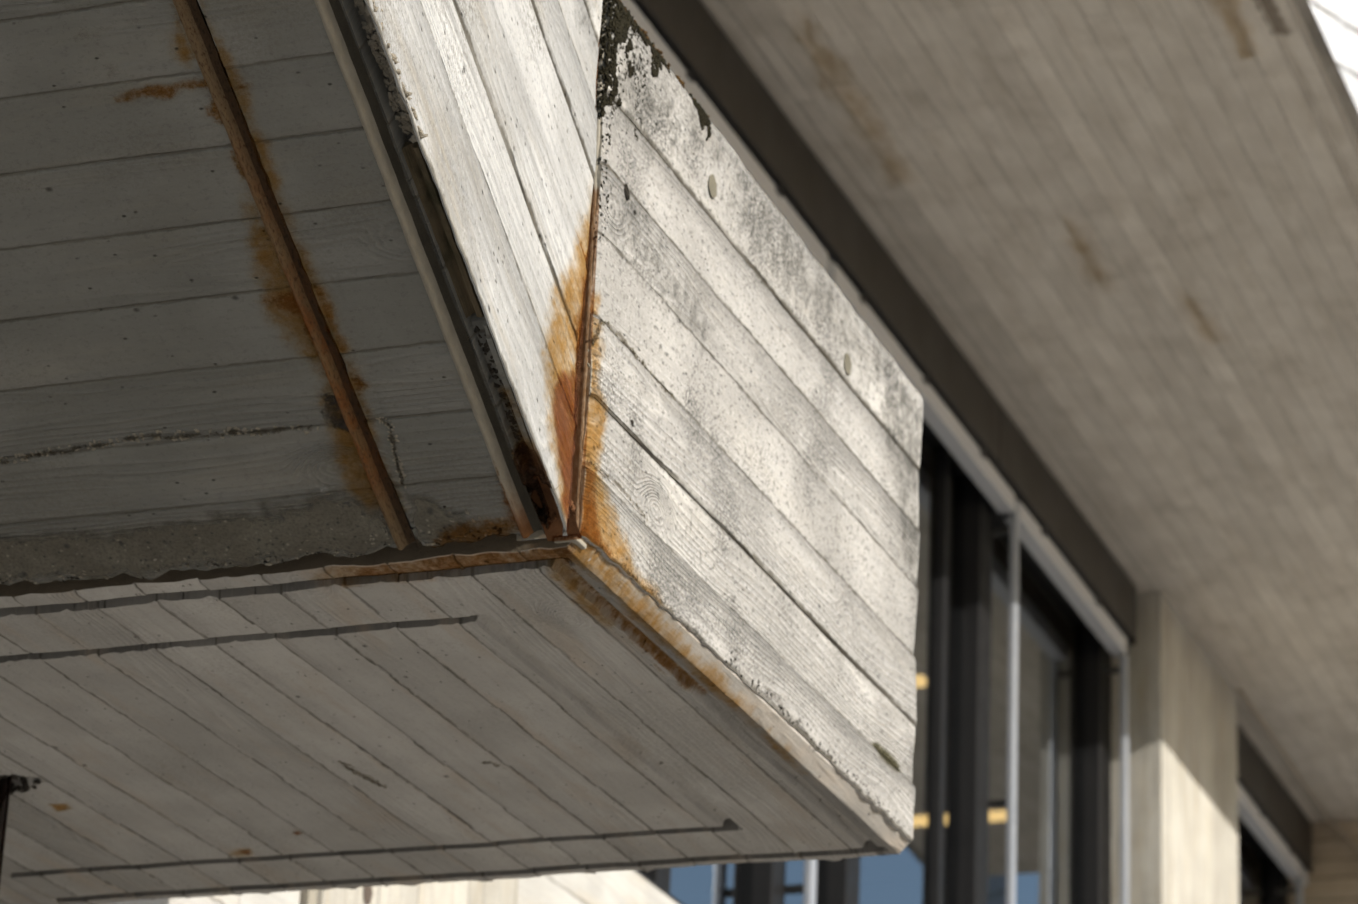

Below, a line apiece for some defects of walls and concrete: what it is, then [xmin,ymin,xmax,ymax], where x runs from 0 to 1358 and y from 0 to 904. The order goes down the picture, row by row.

spalling [354,0,428,143]
crack [0,425,319,465]
spalling [474,326,581,541]
corrosion [552,188,607,553]
spalling [0,495,395,585]